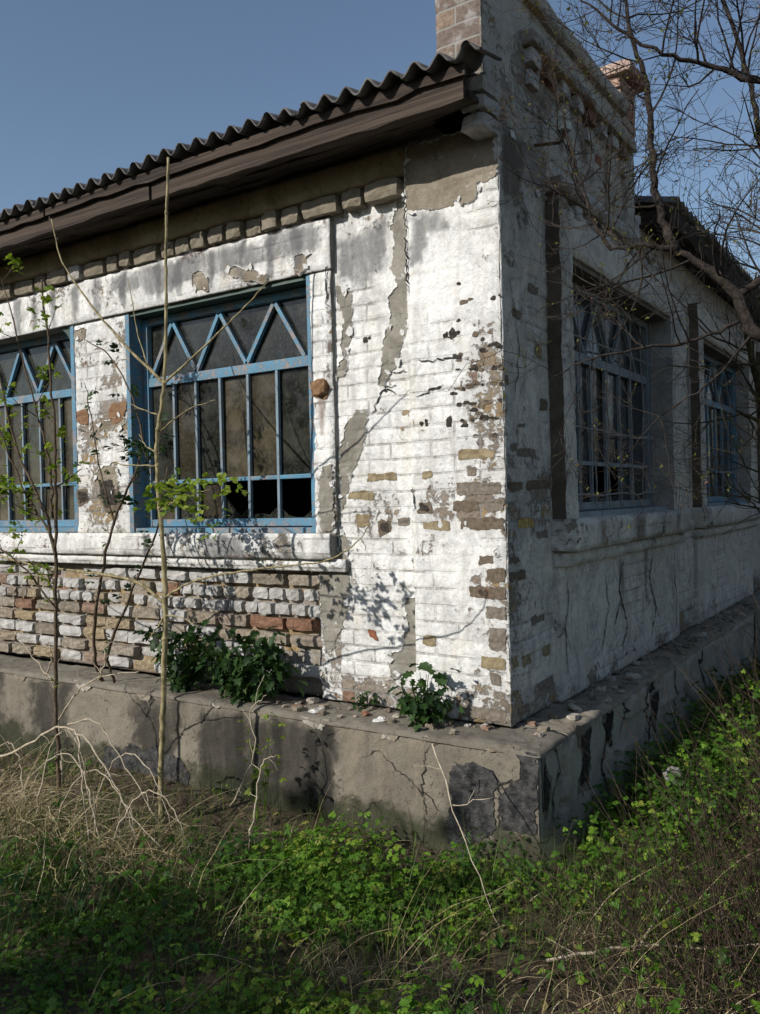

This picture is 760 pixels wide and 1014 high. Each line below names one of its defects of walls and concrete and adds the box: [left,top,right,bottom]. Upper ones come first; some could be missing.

peeling [76,401,127,433]
crack [372,333,461,413]
spalling [419,352,550,531]
peeling [317,409,397,653]
spalling [355,514,410,532]
peeling [385,596,436,680]
spalling [461,555,532,723]
crack [564,574,572,682]
crack [602,561,628,651]
crack [649,552,677,636]
leakage [186,715,579,883]
crack [369,743,442,831]